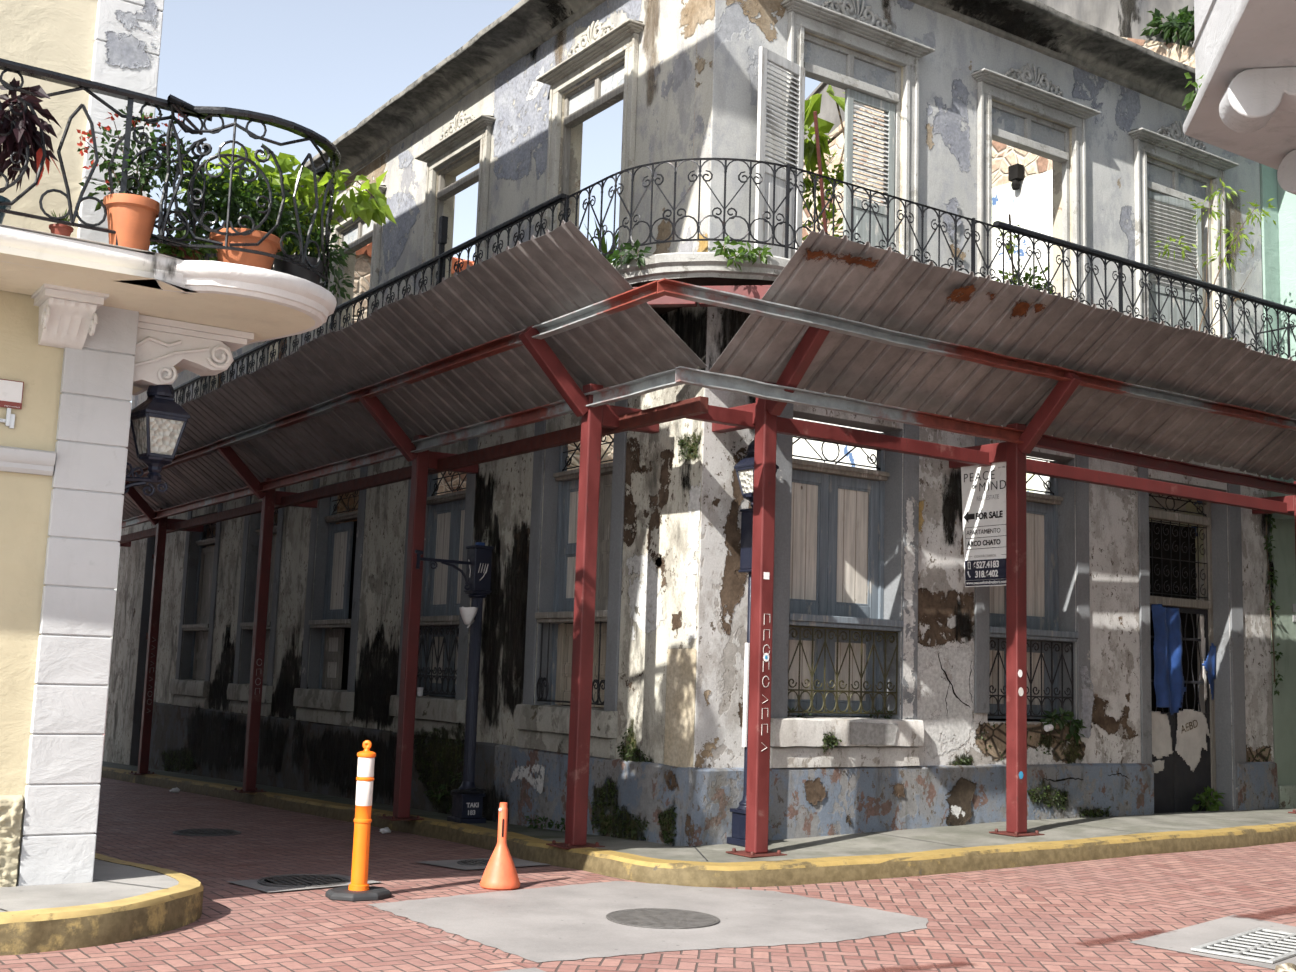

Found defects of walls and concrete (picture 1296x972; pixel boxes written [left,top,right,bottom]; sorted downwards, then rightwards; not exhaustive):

peeling [104,0,159,69]
water stain [540,0,572,64]
peeling [492,0,642,190]
water stain [643,0,658,105]
peeling [679,0,789,88]
mould [947,0,1062,53]
water stain [1118,0,1139,38]
peeling [623,437,751,643]
mould [474,469,530,728]
peeling [899,497,1006,762]
mould [187,624,399,802]
spalling [1027,665,1138,765]